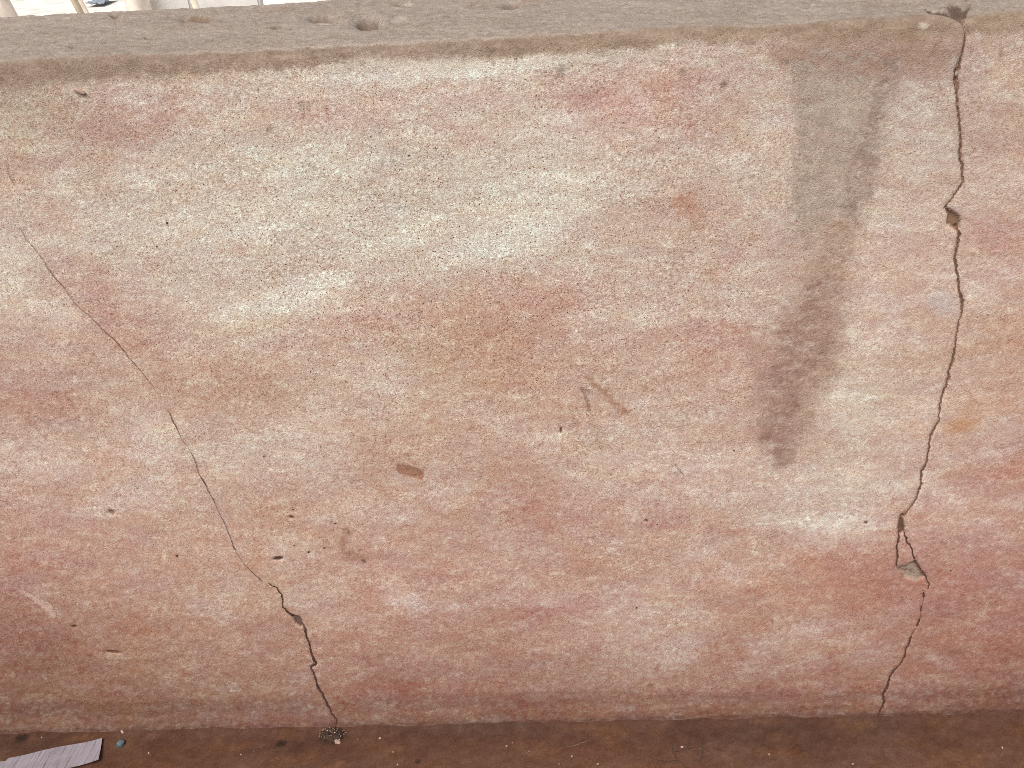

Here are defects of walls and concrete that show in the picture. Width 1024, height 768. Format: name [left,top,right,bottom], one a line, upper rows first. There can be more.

crack [21,230,337,725]
damp [739,25,970,473]
crack [878,0,974,716]